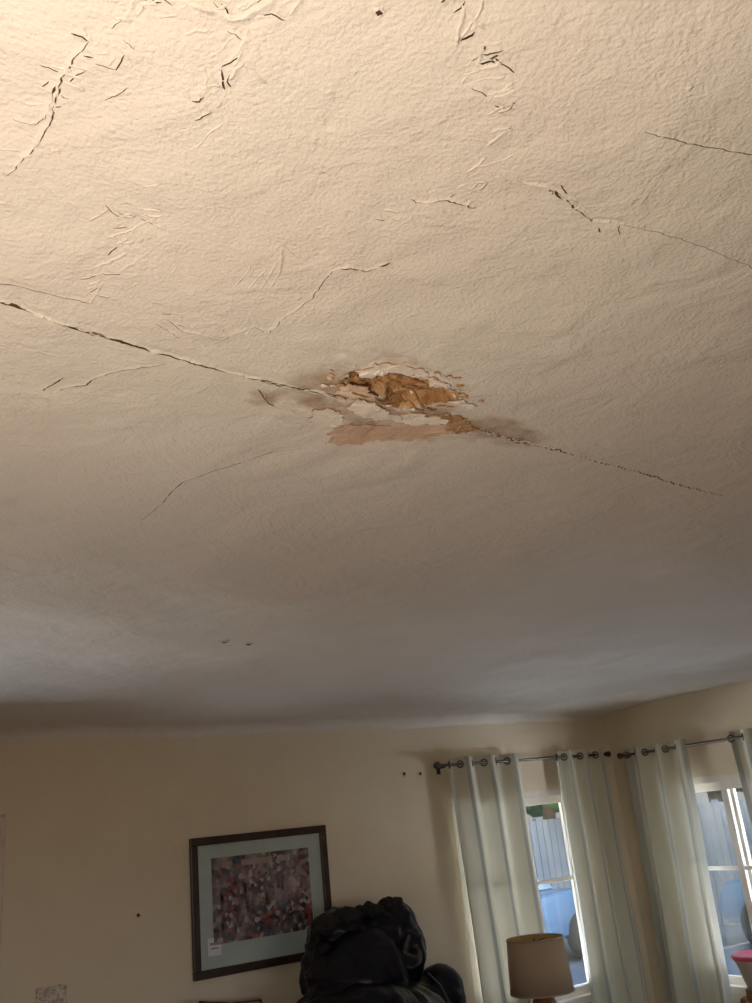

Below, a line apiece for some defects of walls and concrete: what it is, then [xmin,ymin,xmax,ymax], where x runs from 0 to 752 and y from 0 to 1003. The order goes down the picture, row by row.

crack [376,181,489,224]
crack [517,179,752,276]
crack [0,261,392,413]
flaking render [284,351,484,446]
crack [138,447,306,522]
crack [465,420,722,496]